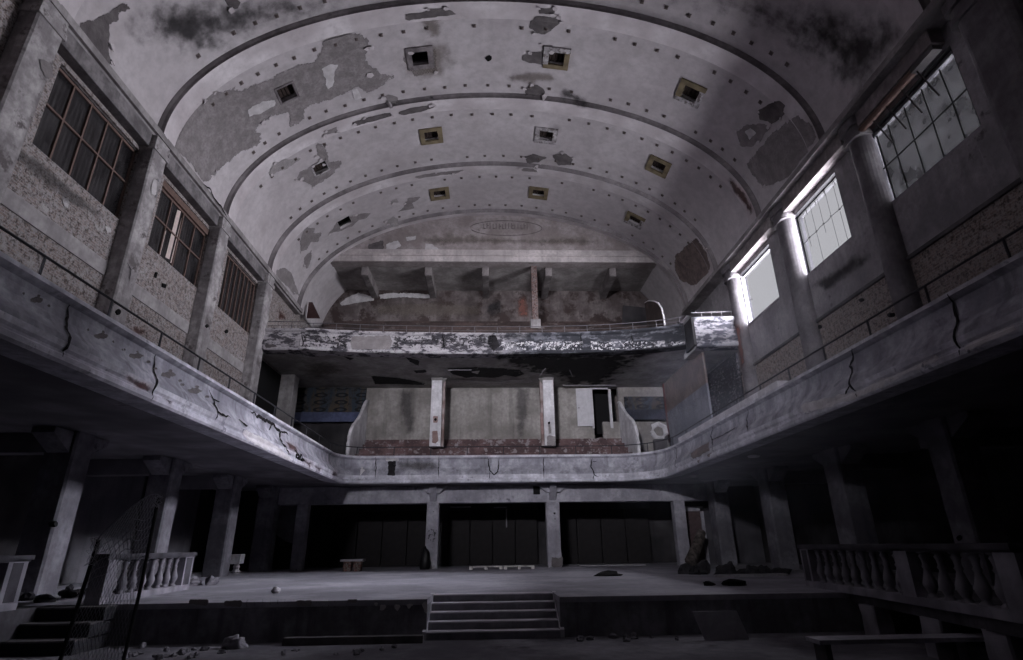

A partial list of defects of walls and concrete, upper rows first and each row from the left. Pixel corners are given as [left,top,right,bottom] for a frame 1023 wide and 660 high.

peeling [80,3,130,66]
peeling [522,7,564,65]
peeling [175,33,438,189]
peeling [735,101,816,189]
peeling [674,238,710,287]
crack [62,305,72,355]
crack [150,355,158,401]
peeling [301,333,685,385]
crack [845,350,857,397]
crack [947,294,961,355]
crack [209,390,305,462]